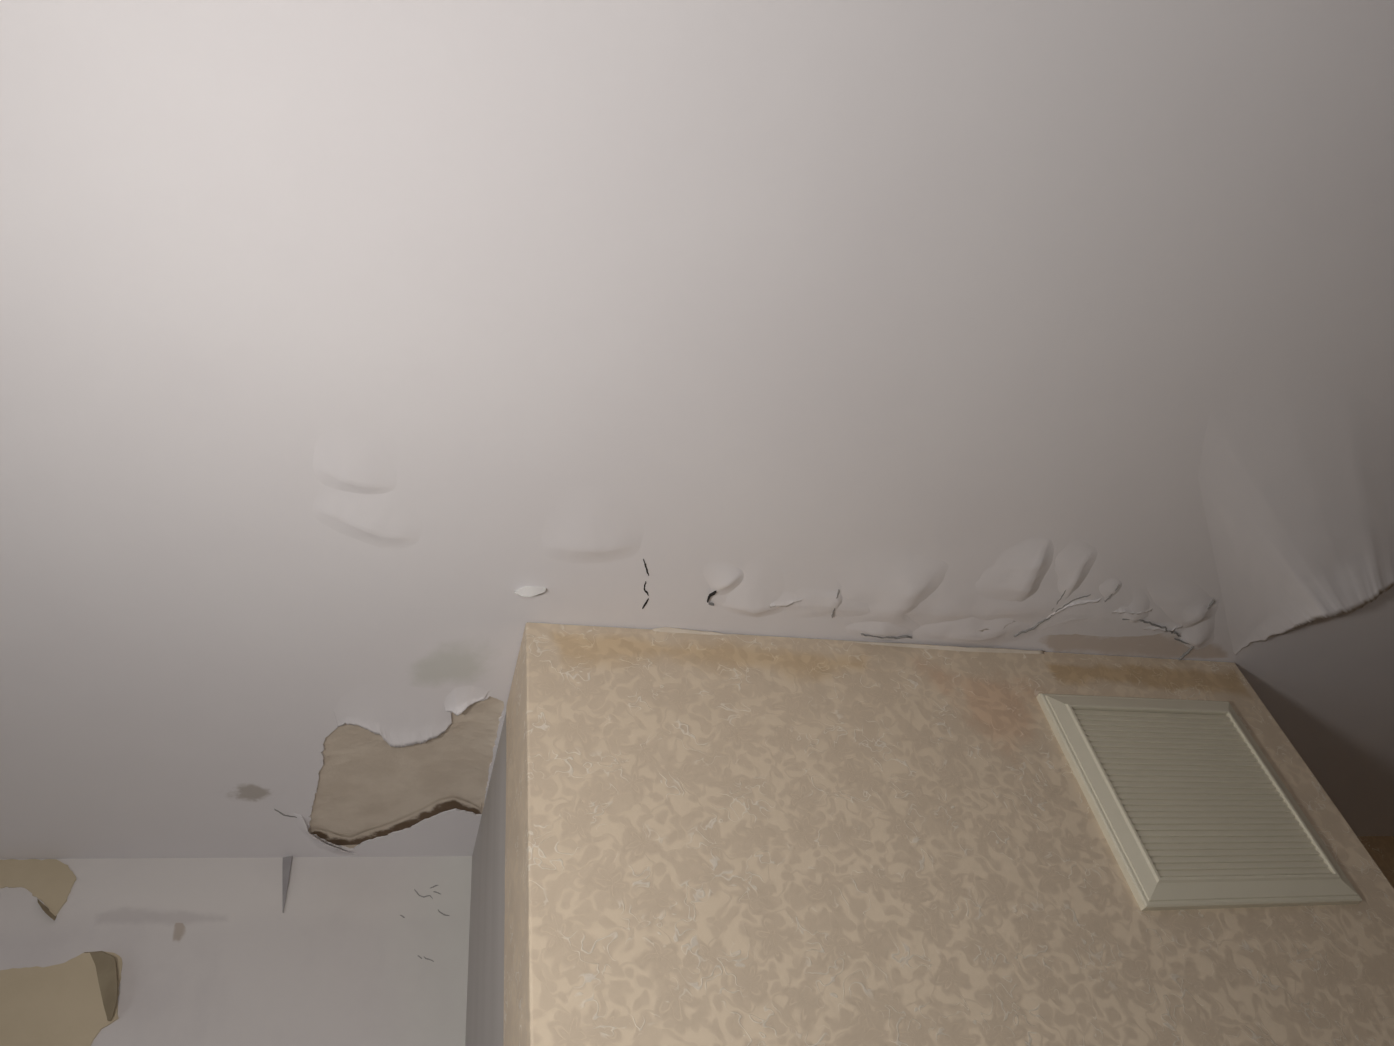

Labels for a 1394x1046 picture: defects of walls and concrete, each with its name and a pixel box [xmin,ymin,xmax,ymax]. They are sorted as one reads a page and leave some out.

spalling [293,679,504,855]
damp [391,617,524,696]
crack [641,559,649,609]
damp [542,626,1264,794]